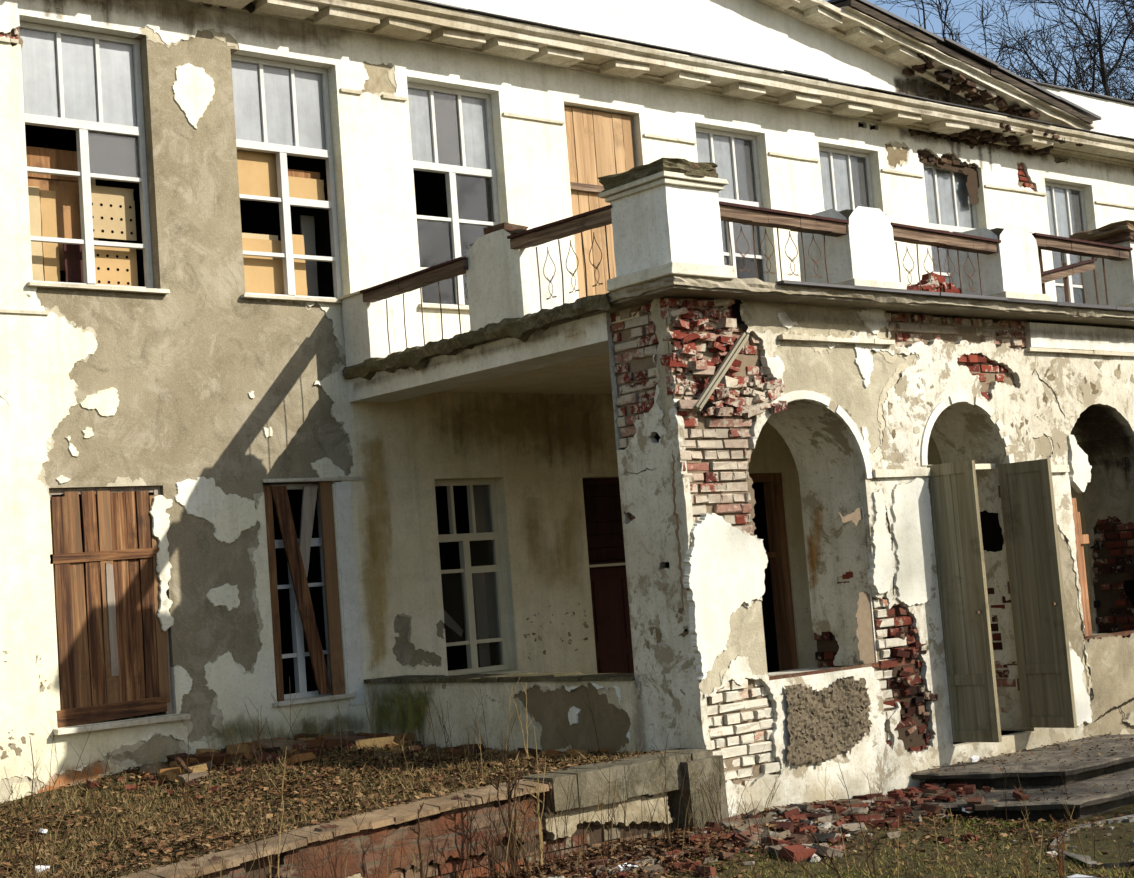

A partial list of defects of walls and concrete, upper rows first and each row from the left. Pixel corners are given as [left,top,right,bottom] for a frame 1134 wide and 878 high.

flaking render [362,61,397,97]
spalling [885,53,1083,204]
flaking render [0,26,353,804]
flaking render [610,297,1134,786]
flaking render [392,613,441,670]
flaking render [513,682,631,752]
crack [1095,698,1134,724]